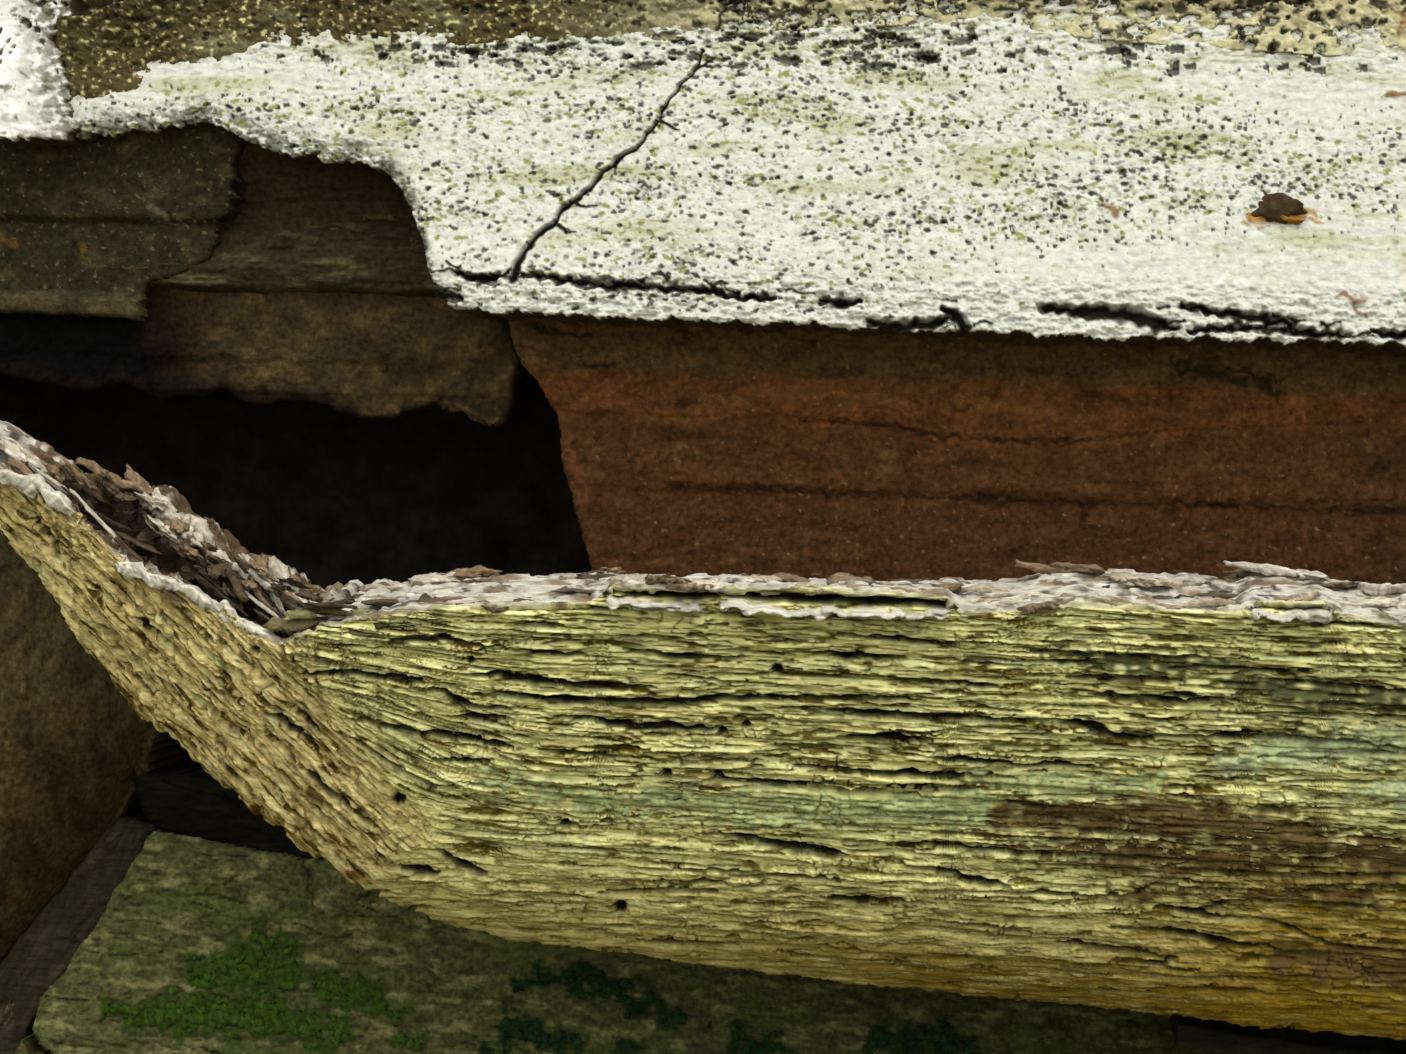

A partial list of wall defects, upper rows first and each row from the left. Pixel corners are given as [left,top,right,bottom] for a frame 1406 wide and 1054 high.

flaking render [0,139,530,429]
crack [489,0,732,283]
rust [1243,209,1324,228]